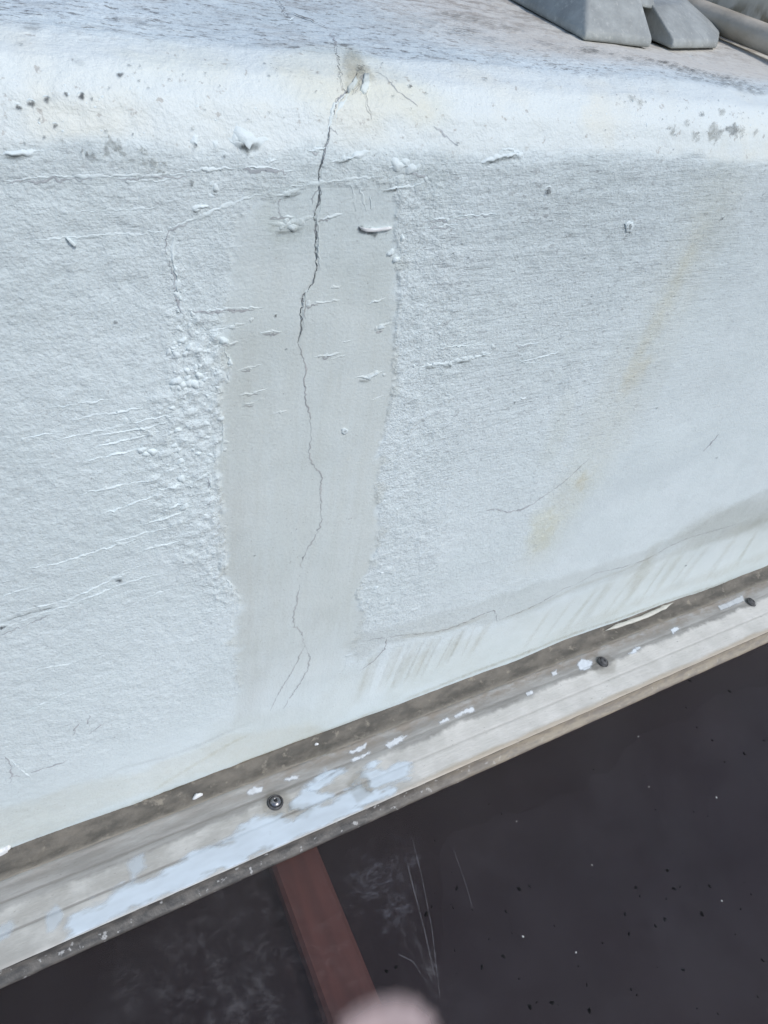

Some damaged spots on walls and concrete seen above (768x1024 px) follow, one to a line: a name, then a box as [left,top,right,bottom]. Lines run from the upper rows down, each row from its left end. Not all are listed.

crack [270,0,417,711]